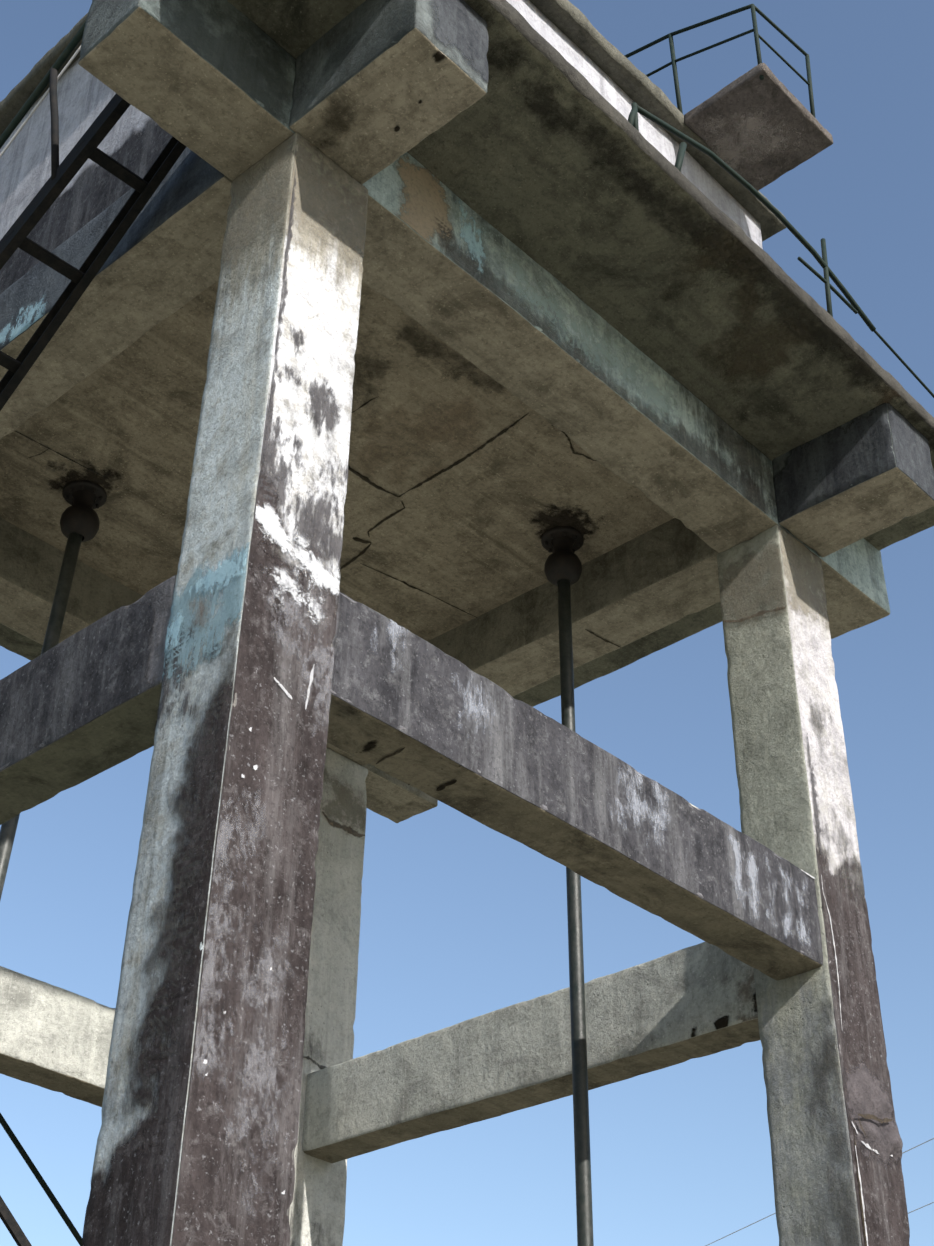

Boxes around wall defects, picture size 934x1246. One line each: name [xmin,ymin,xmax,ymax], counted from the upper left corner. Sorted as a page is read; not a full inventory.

water stain [0,118,172,294]
crack [339,413,597,618]
water stain [0,601,196,771]
water stain [82,135,910,1246]
spalling [714,1015,729,1030]